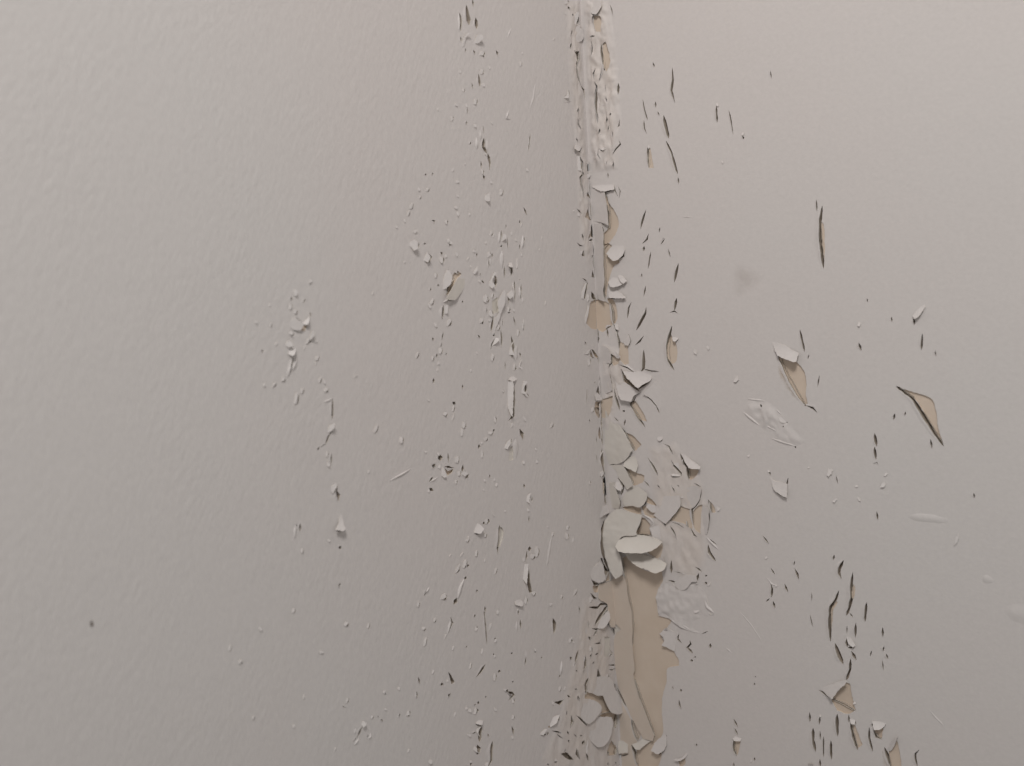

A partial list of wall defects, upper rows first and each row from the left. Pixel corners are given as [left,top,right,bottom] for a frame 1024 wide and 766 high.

peeling [451,0,498,201]
peeling [396,173,529,397]
peeling [425,451,469,493]
flaking render [540,0,720,766]
peeling [772,342,818,412]
peeling [895,386,944,447]
peeling [819,637,901,766]